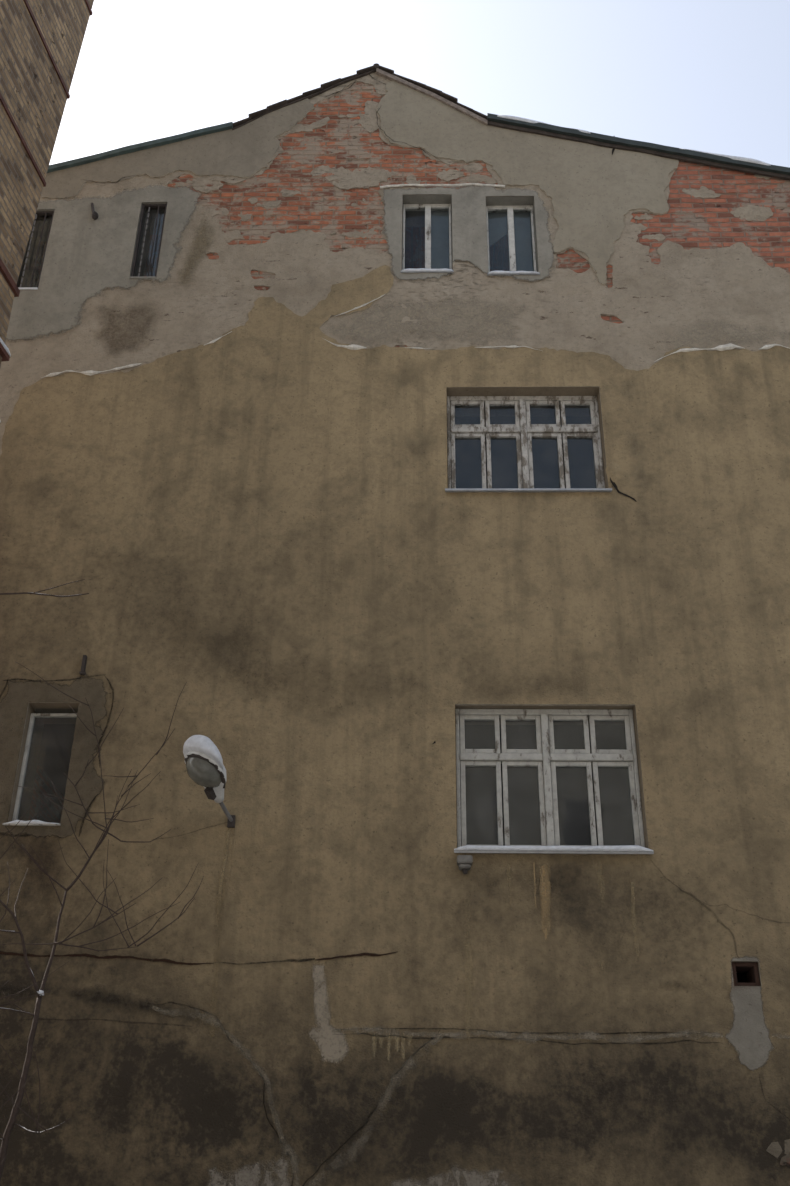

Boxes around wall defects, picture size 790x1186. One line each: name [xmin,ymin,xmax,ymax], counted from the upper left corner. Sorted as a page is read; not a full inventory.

spalling [0,72,790,456]
crack [610,478,637,502]
crack [0,951,398,965]
crack [151,1002,723,1186]
spalling [766,1139,790,1167]